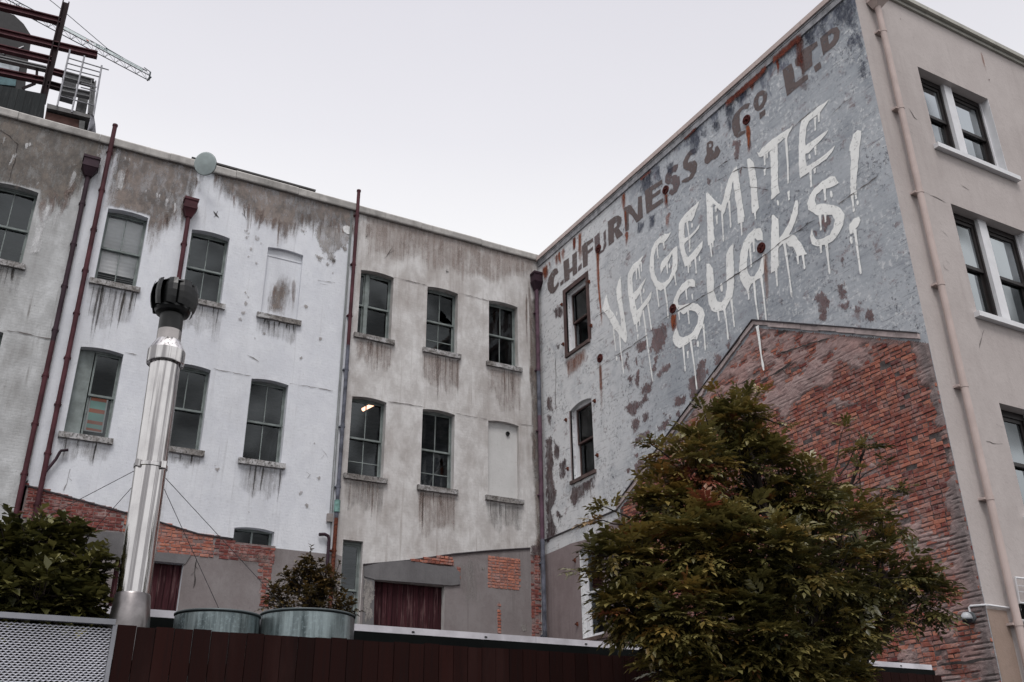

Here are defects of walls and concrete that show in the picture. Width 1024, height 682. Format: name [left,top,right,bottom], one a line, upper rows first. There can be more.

leakage [0,117,197,253]
leakage [214,174,355,237]
leakage [264,284,295,331]
flaking render [19,483,127,532]
flaking render [488,397,566,637]
spalling [616,281,1001,682]
flaking render [156,523,276,607]